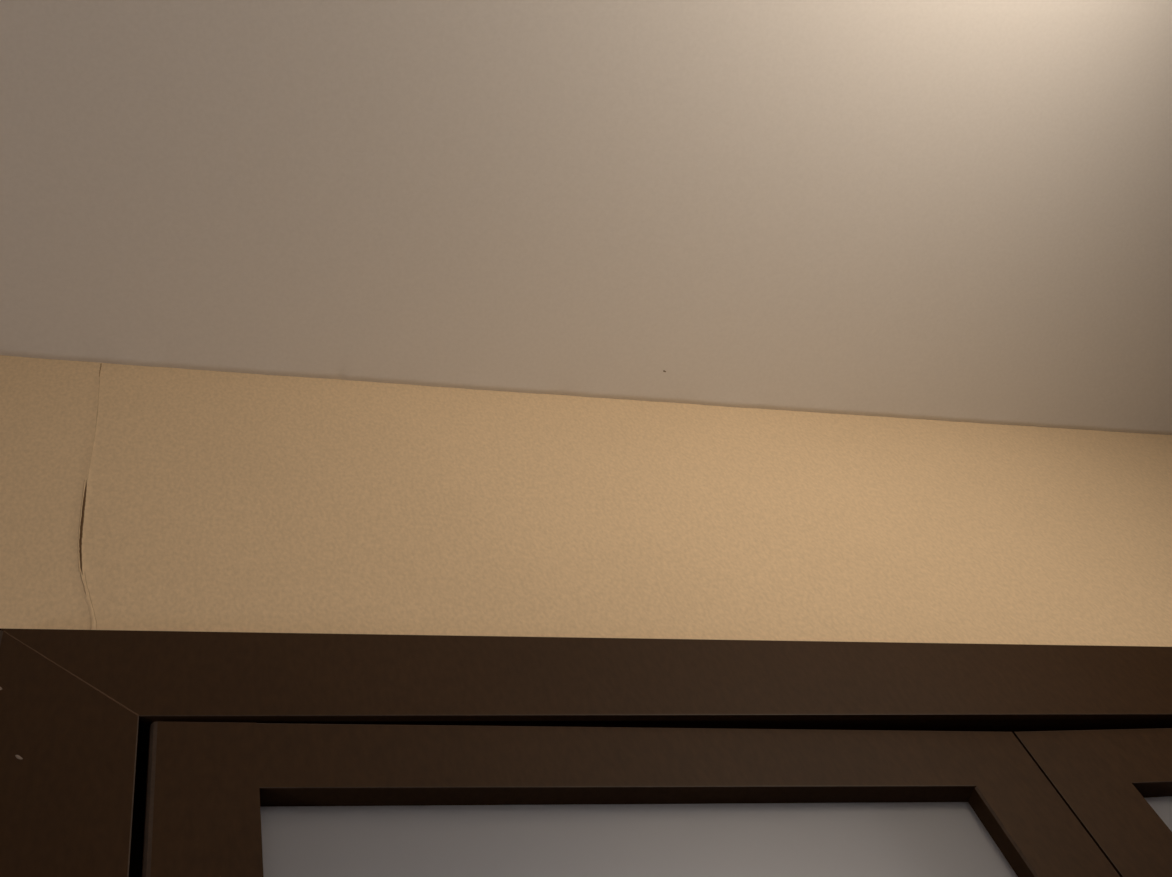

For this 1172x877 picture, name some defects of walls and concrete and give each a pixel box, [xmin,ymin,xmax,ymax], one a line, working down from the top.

crack [78,363,102,630]